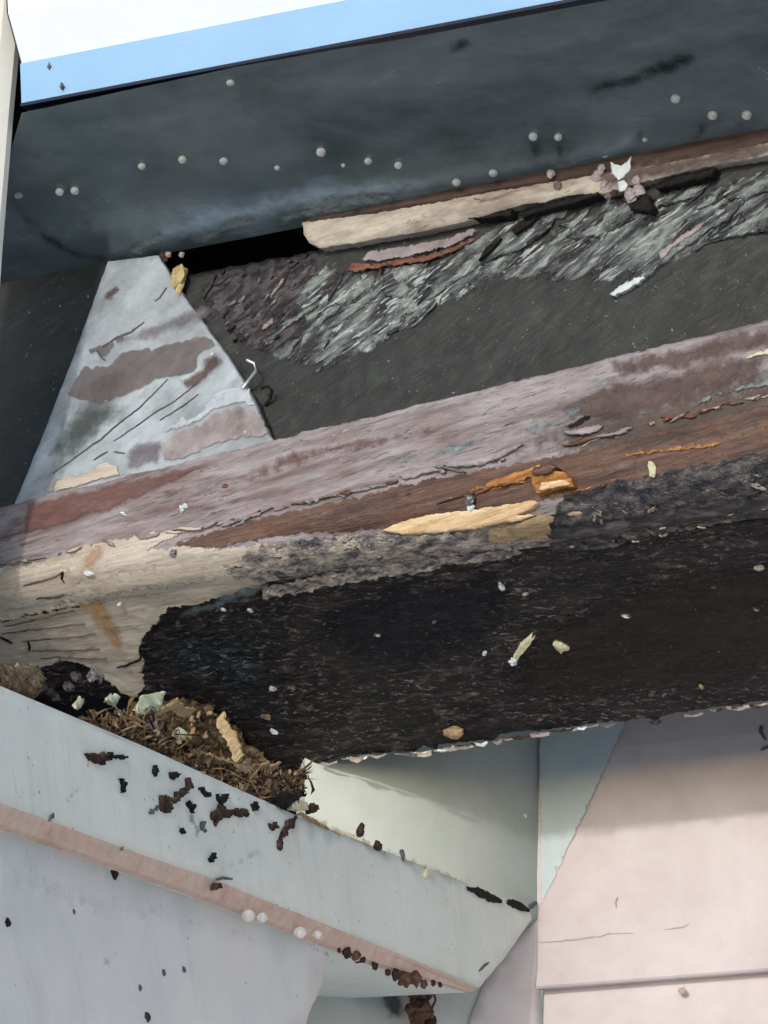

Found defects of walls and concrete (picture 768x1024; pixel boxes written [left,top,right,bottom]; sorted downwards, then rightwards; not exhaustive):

spalling [11,60,27,147]
peeling [155,156,768,372]
peeling [68,336,214,404]
peeling [161,388,267,460]
peeling [562,425,633,447]
peeling [137,438,523,540]
peeling [223,453,768,601]
spalling [34,696,136,718]
water stain [163,619,266,716]
water stain [329,576,506,662]
water stain [511,569,768,702]
crack [538,933,633,943]